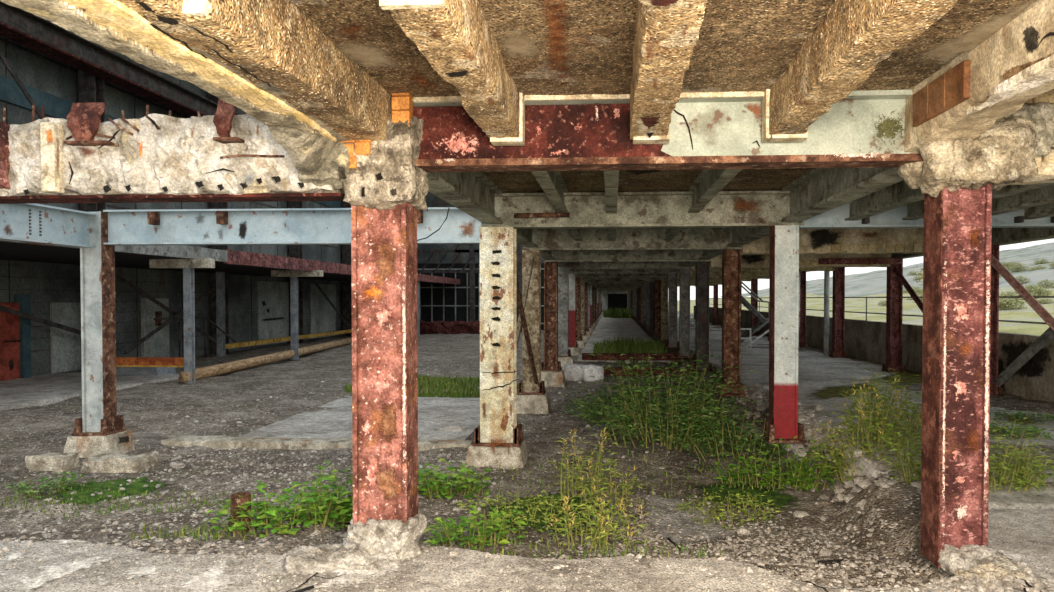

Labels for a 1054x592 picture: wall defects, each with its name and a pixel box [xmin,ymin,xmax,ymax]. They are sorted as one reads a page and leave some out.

corrosion [412,104,671,159]
corrosion [365,241,396,299]
corrosion [381,401,398,441]